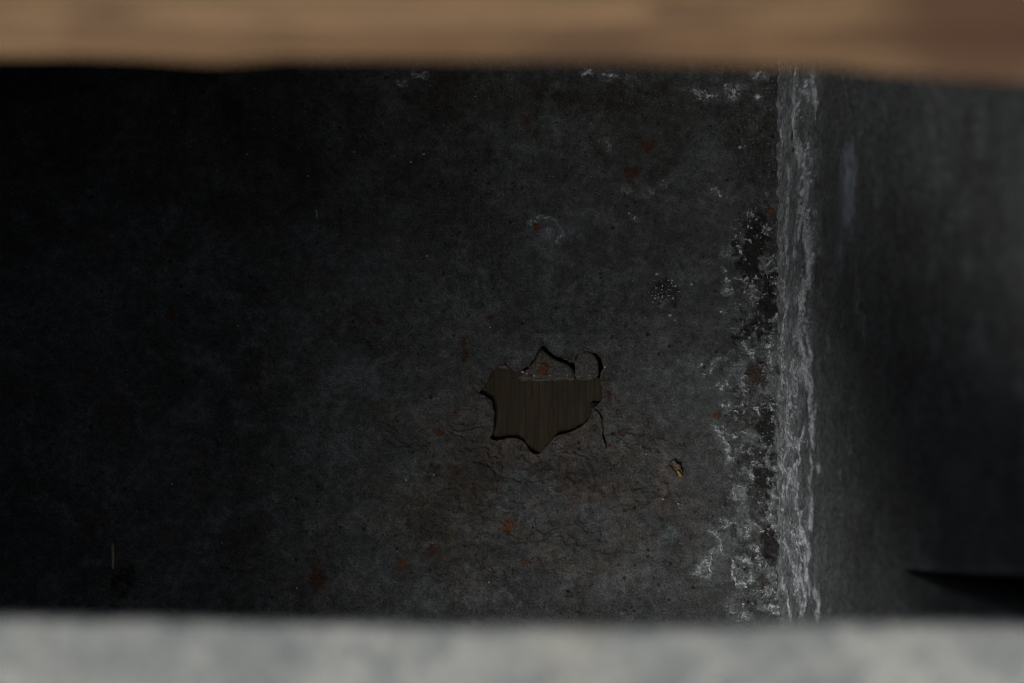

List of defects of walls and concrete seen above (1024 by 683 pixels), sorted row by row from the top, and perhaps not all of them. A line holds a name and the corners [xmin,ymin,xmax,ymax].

peeling [518,350,599,381]
leakage [693,67,829,622]